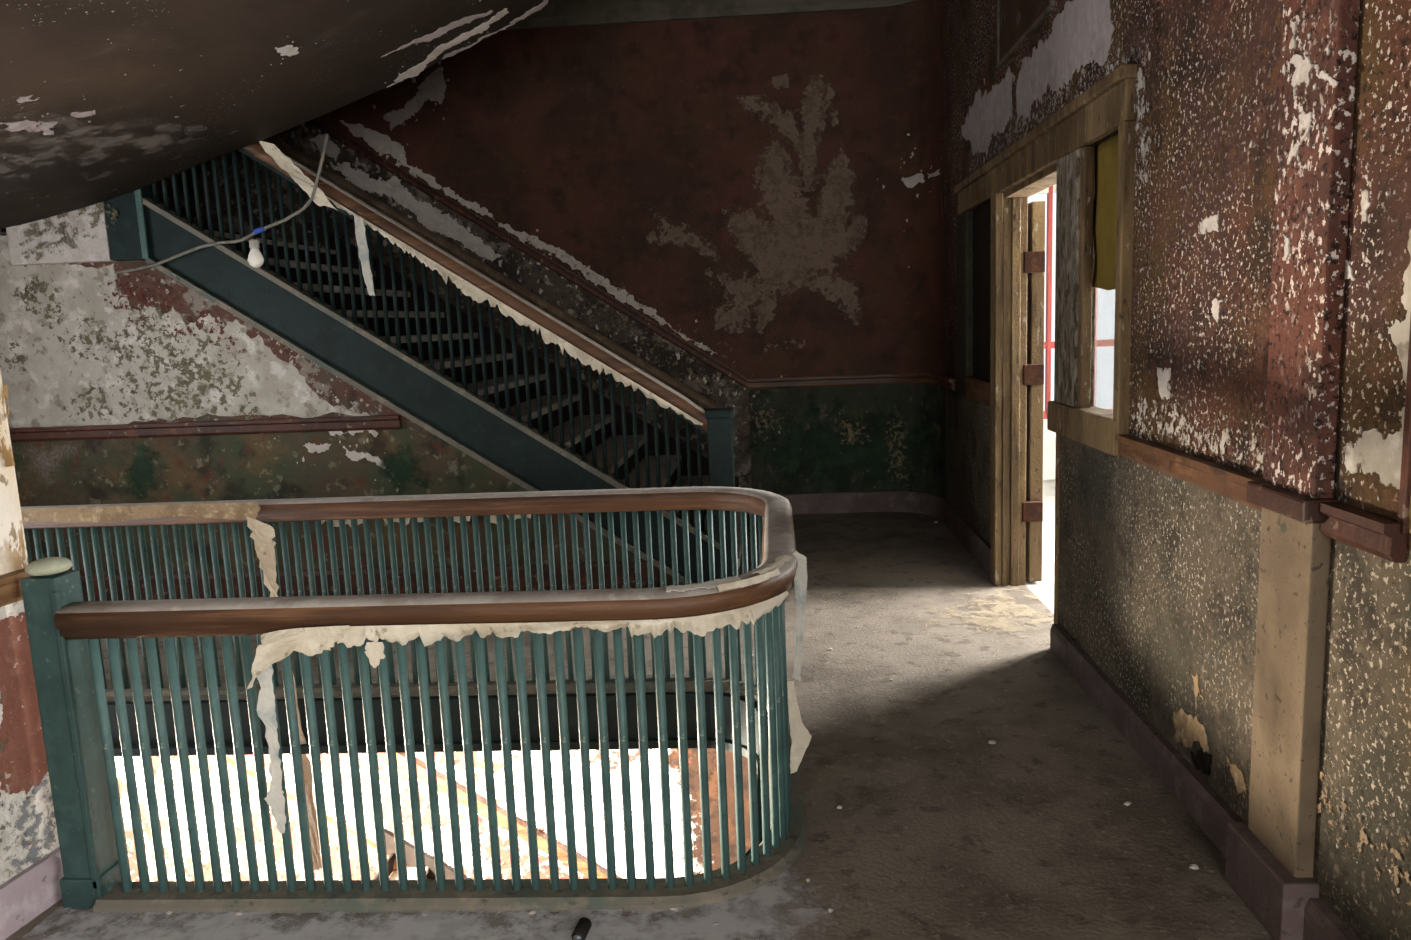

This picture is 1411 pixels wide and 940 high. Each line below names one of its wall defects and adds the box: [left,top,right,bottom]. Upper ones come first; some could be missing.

peeling [0,95,96,135]
flaking render [901,0,1151,198]
flaking render [0,202,371,447]
peeling [259,8,805,443]
peeling [1131,298,1264,474]
peeling [1344,189,1396,301]
flaking render [1343,407,1405,501]
flaking render [1378,229,1411,391]
peeling [21,502,279,597]
flaking render [0,612,56,877]
flaking render [115,756,248,876]
peeling [247,551,812,879]